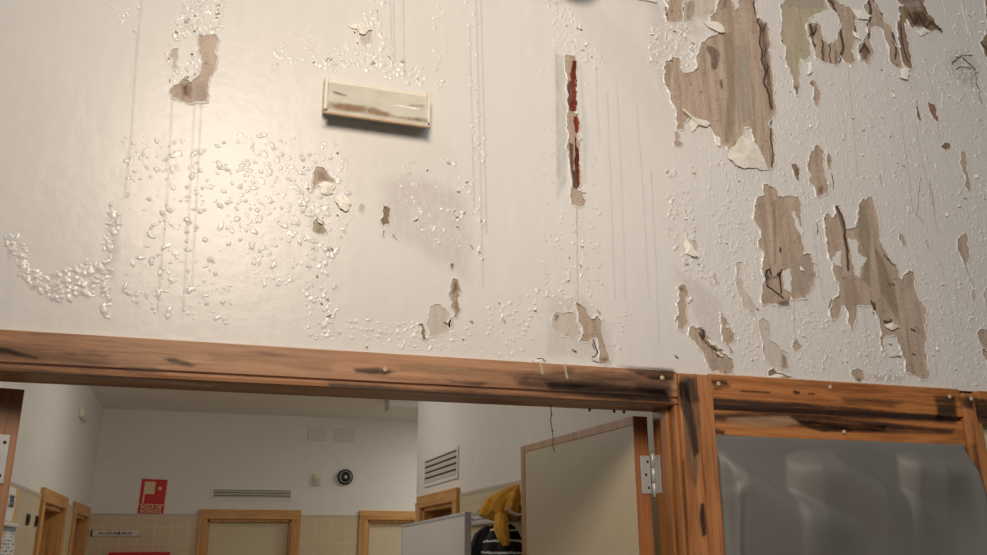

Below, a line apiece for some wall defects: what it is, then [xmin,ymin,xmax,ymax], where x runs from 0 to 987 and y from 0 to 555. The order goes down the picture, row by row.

peeling [168,33,221,105]
peeling [661,0,943,171]
peeling [979,0,987,58]
peeling [417,262,462,342]
peeling [550,301,611,366]
peeling [674,283,736,375]
peeling [735,183,818,379]
peeling [790,144,931,383]